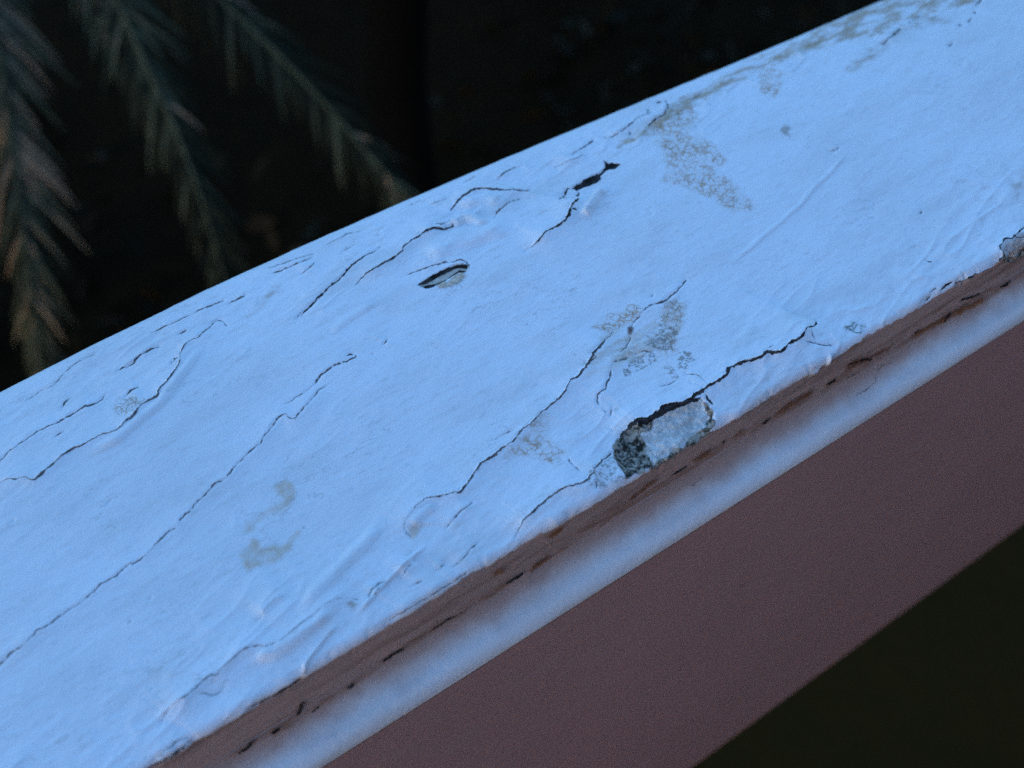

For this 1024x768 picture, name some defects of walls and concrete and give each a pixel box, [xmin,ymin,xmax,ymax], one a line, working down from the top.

crack [268,167,530,314]
peeling [418,263,469,288]
crack [529,188,580,248]
crack [0,296,244,483]
crack [0,354,356,665]
crack [415,280,831,530]
spalling [612,397,715,479]